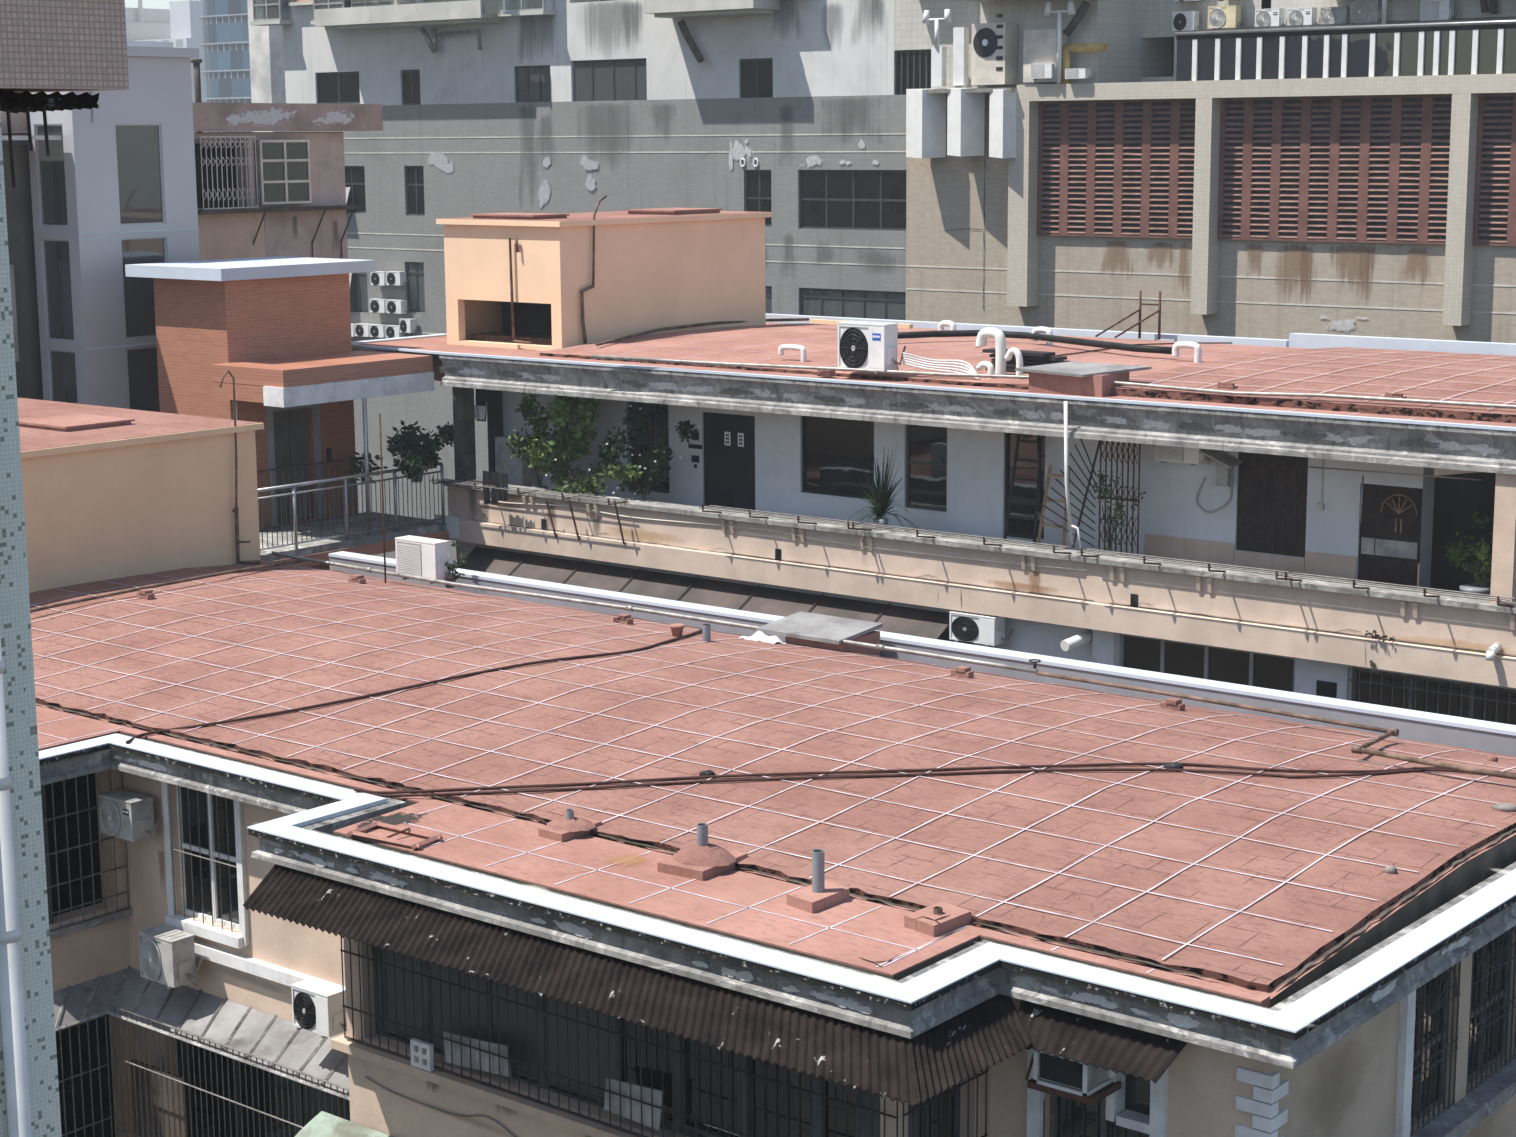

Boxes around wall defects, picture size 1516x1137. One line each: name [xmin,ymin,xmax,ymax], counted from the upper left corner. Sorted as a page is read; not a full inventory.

peeling [226,107,355,128]
spalling [439,353,1374,445]
spalling [1111,388,1516,423]
crack [36,702,548,823]
spalling [35,698,552,825]
crack [589,832,677,853]
spalling [589,830,680,852]
spalling [735,863,812,884]
crack [736,867,812,885]
spalling [850,888,928,909]
spalling [971,823,1516,993]
crack [850,893,1217,979]